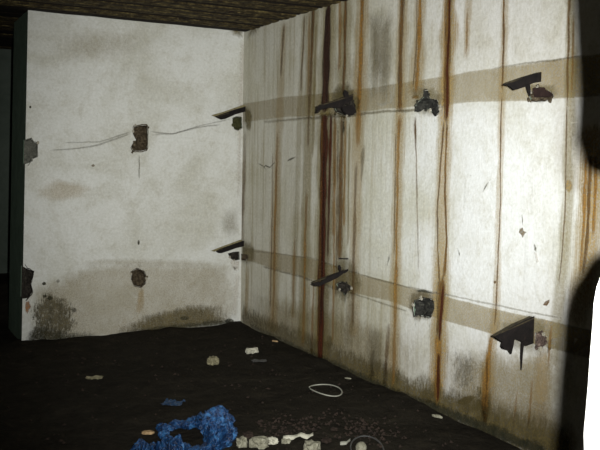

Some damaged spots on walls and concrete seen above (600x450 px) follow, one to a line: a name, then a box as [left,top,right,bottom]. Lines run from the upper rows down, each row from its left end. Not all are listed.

spalling [24,138,39,164]
spalling [131,124,149,154]
rust [301,0,364,358]
rust [384,0,423,379]
rust [430,0,458,401]
rust [572,127,600,321]
spalling [21,261,34,313]
damp [29,293,87,340]
spalling [130,268,148,288]
damp [129,307,233,332]
spalling [411,295,434,318]
damp [242,310,573,450]